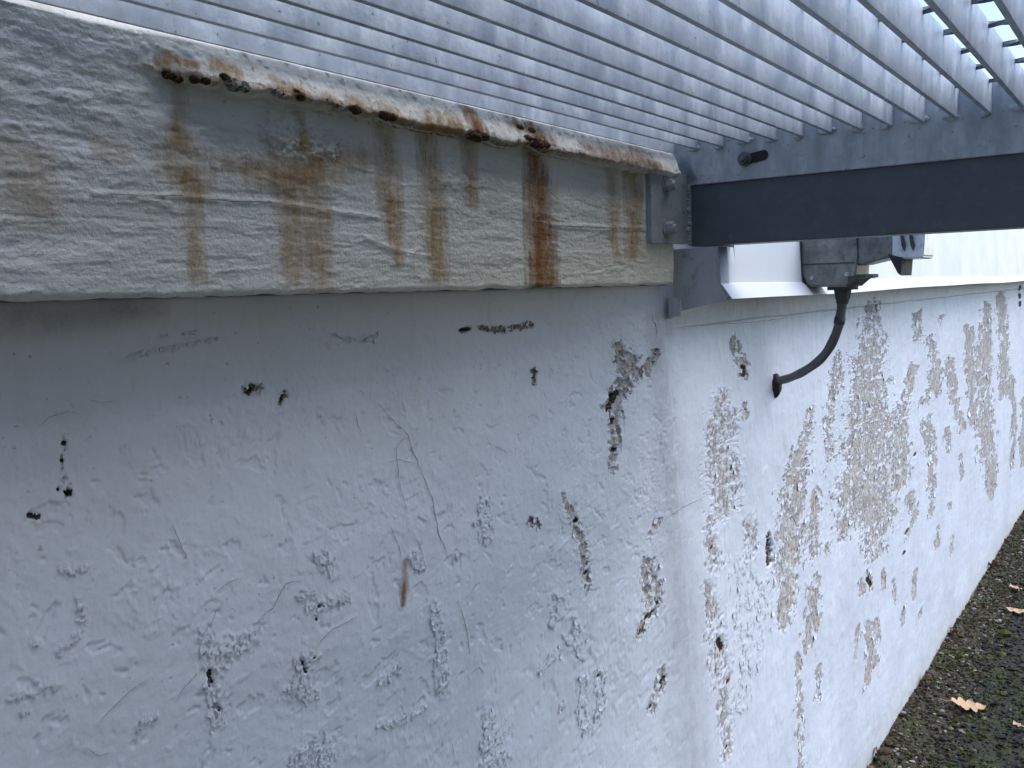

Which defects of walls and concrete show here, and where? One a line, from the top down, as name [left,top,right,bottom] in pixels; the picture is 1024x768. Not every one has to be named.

rust [268,78,657,288]
spalling [242,383,264,396]
peeling [458,321,534,334]
flaking render [599,340,661,476]
flaking render [729,334,751,381]
spalling [56,437,72,498]
crack [379,404,447,568]
peeling [812,285,1021,628]
peeling [561,493,592,595]
peeling [743,521,777,566]
flaking render [634,556,666,641]
peeling [813,663,822,702]